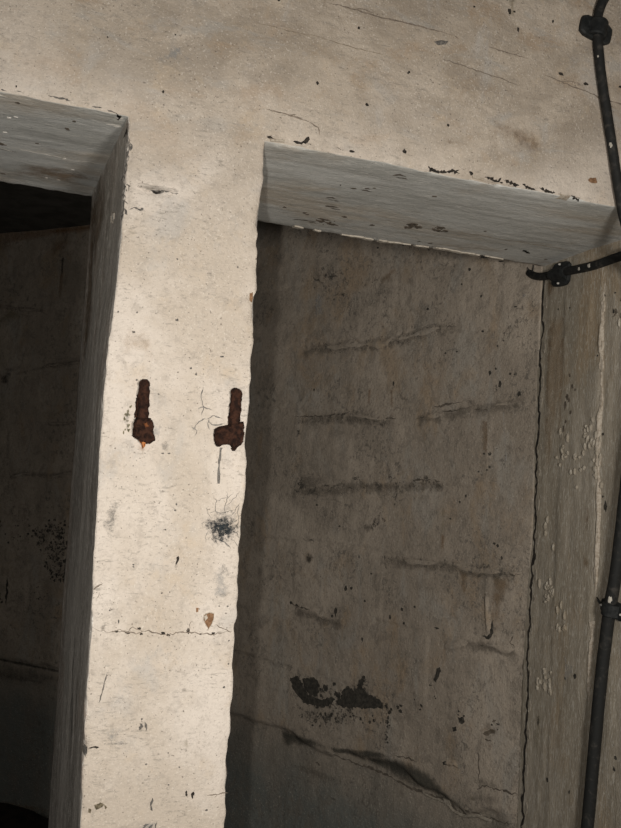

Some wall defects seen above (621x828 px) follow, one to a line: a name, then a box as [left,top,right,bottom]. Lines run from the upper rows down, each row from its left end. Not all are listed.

crack [96,622,232,636]
crack [316,280,547,828]